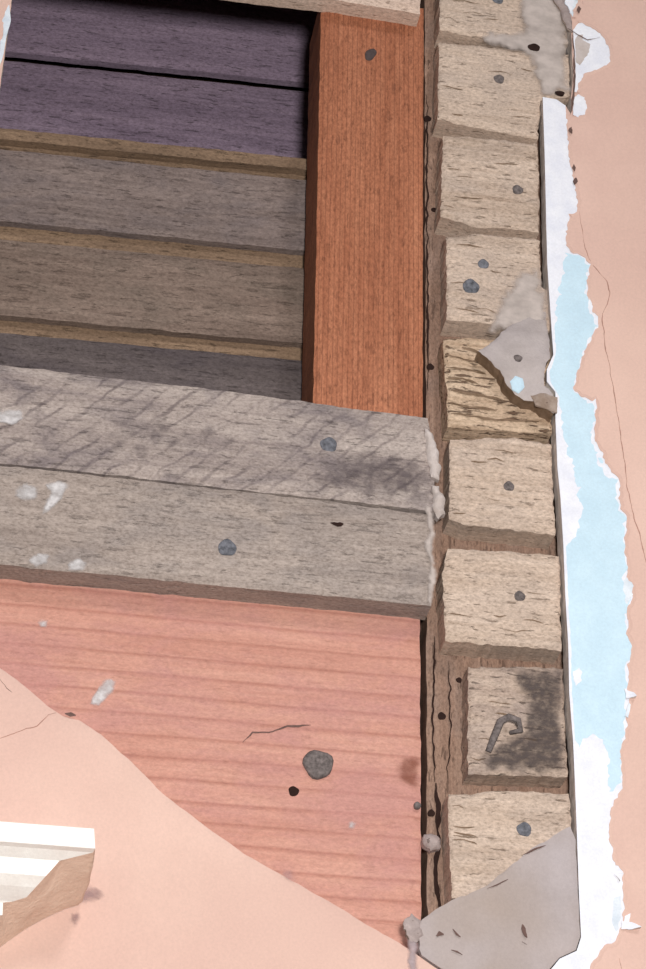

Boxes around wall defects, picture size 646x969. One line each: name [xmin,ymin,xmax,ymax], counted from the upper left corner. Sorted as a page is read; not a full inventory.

flaking render [0,5,11,64]
peeling [510,376,524,394]
crack [579,211,646,561]
peeling [543,0,642,969]
crack [1,712,76,738]
water stain [490,672,563,771]